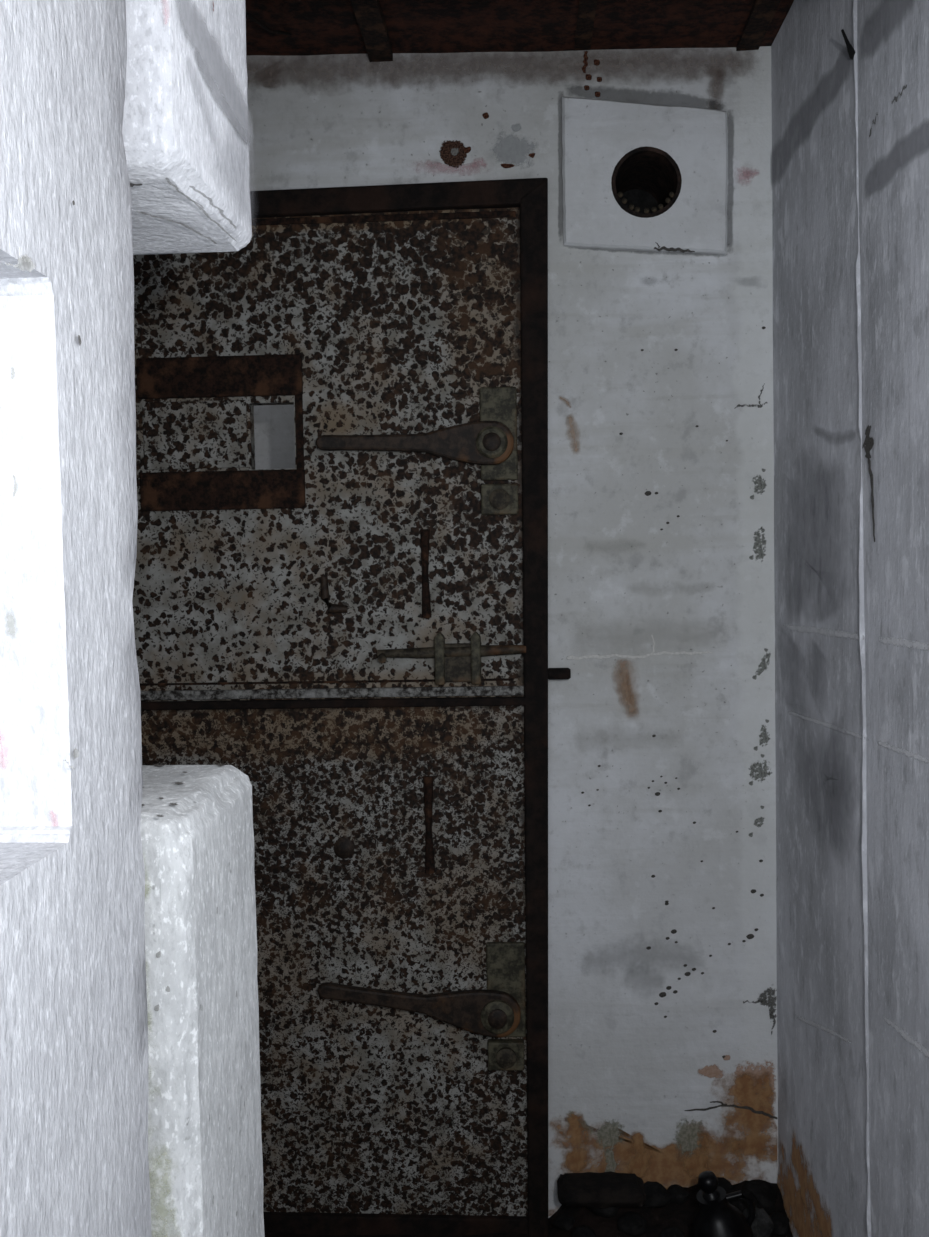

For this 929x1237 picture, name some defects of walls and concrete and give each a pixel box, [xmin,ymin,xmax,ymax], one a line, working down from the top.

corrosion [620,661,635,713]
spalling [654,964,704,1018]
peeling [698,1055,775,1120]
peeling [676,1120,701,1154]
corrosion [553,1073,832,1237]